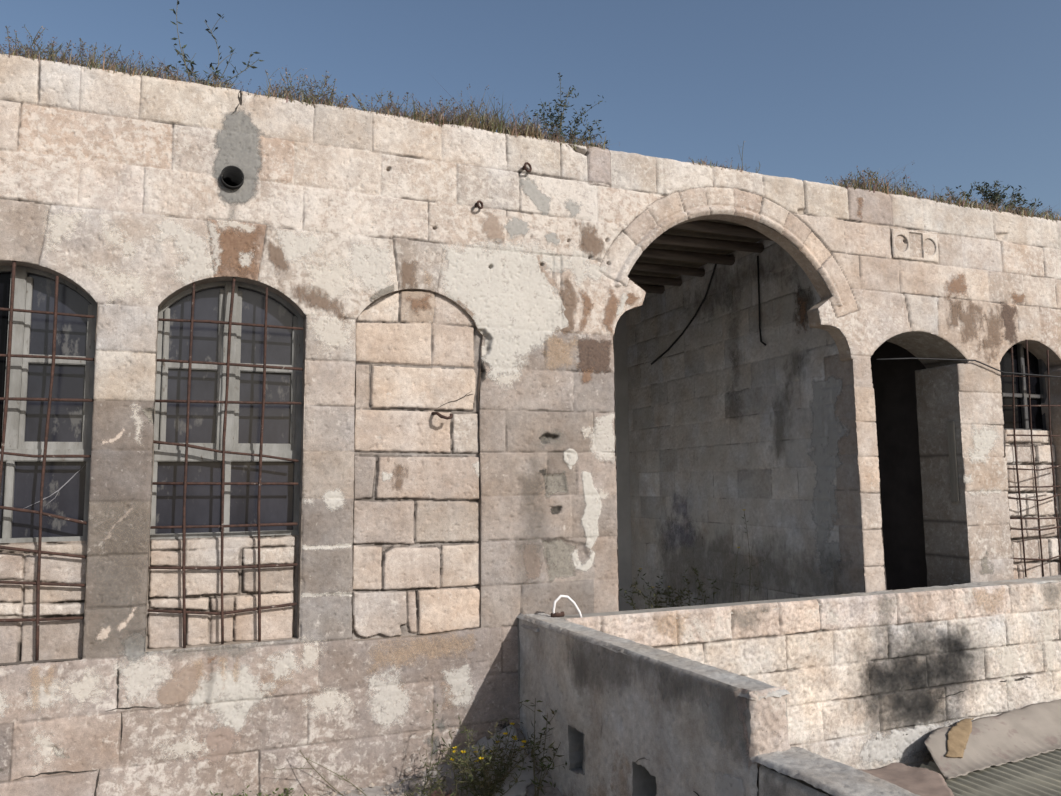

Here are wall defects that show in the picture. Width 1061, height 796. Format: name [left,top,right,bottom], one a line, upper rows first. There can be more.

leakage [483,213,504,239]
leakage [537,256,638,383]
leakage [947,274,1025,362]
spalling [539,433,560,443]
flaking render [582,414,616,460]